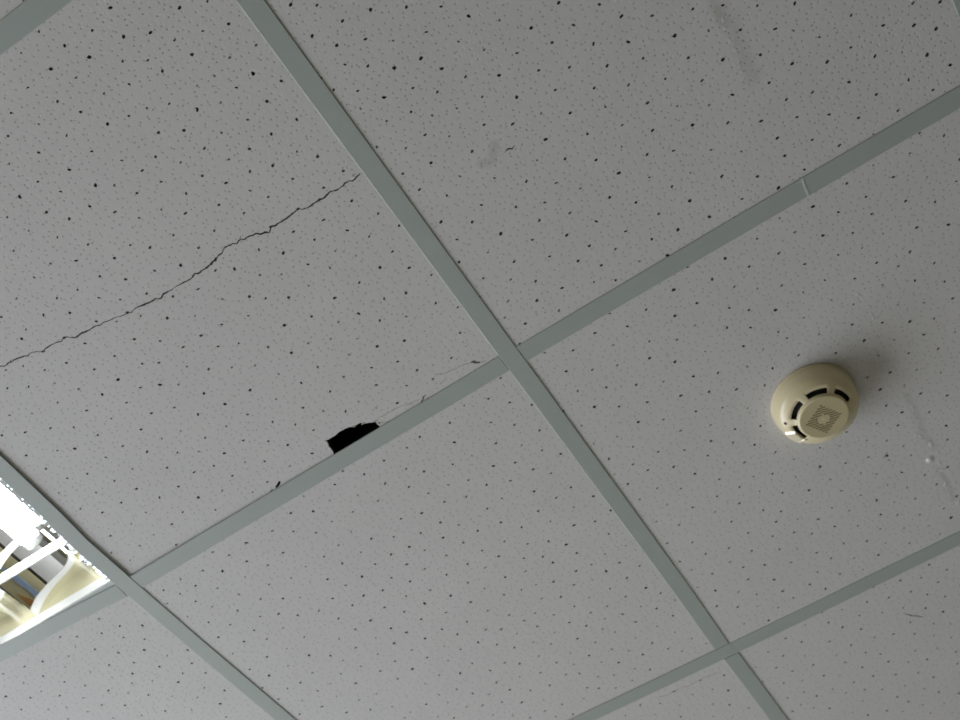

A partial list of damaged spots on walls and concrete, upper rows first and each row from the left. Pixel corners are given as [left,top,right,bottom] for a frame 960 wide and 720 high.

crack [0,174,360,367]
spalling [325,420,381,454]